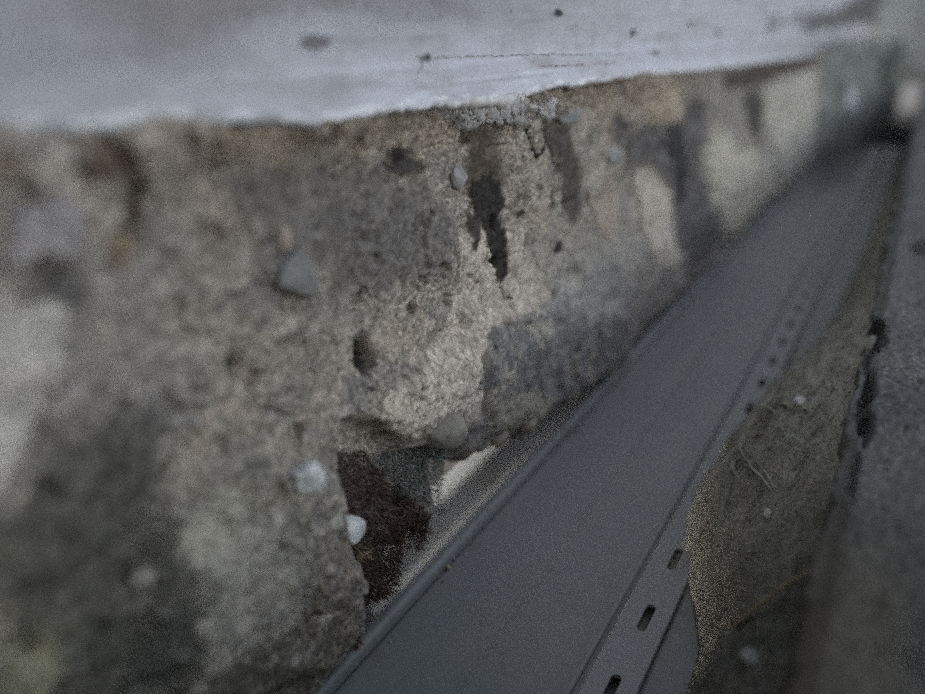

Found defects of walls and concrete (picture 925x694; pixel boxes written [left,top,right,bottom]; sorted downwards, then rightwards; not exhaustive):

peeling [439,92,557,132]
spalling [637,82,685,124]
spalling [702,64,818,240]
spalling [633,168,683,271]
spalling [352,309,413,372]
spalling [376,210,552,442]
spalling [174,489,319,678]